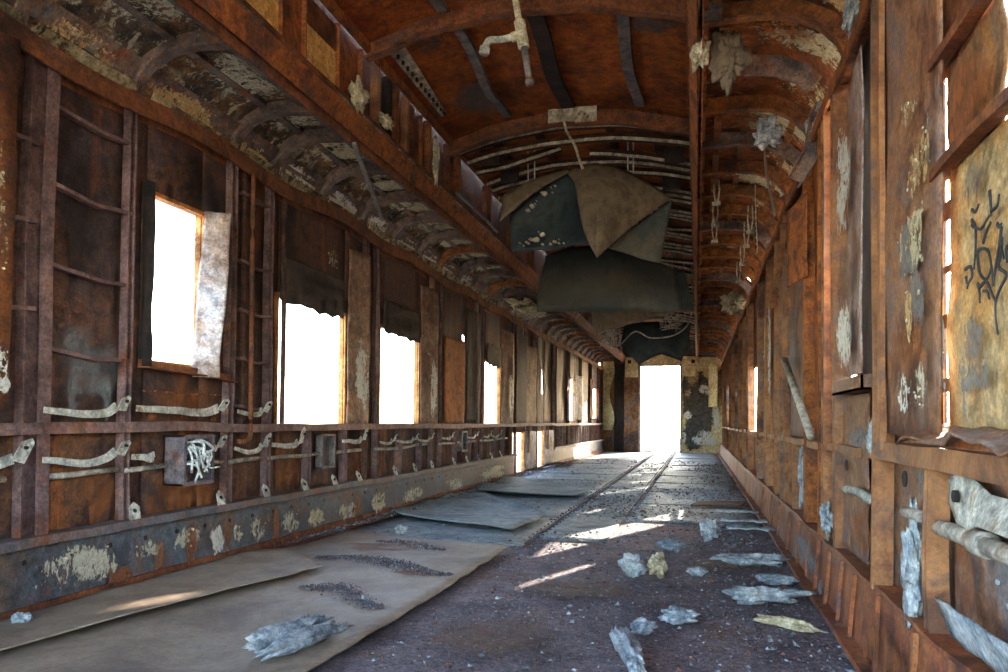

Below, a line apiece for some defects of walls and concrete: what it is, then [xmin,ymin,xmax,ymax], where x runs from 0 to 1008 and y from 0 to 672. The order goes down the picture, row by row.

peeling [836,125,851,236]
peeling [897,126,930,342]
peeling [836,300,852,368]
peeling [896,363,925,413]
peeling [682,407,720,446]
peeling [171,514,266,556]
peeling [35,544,118,593]